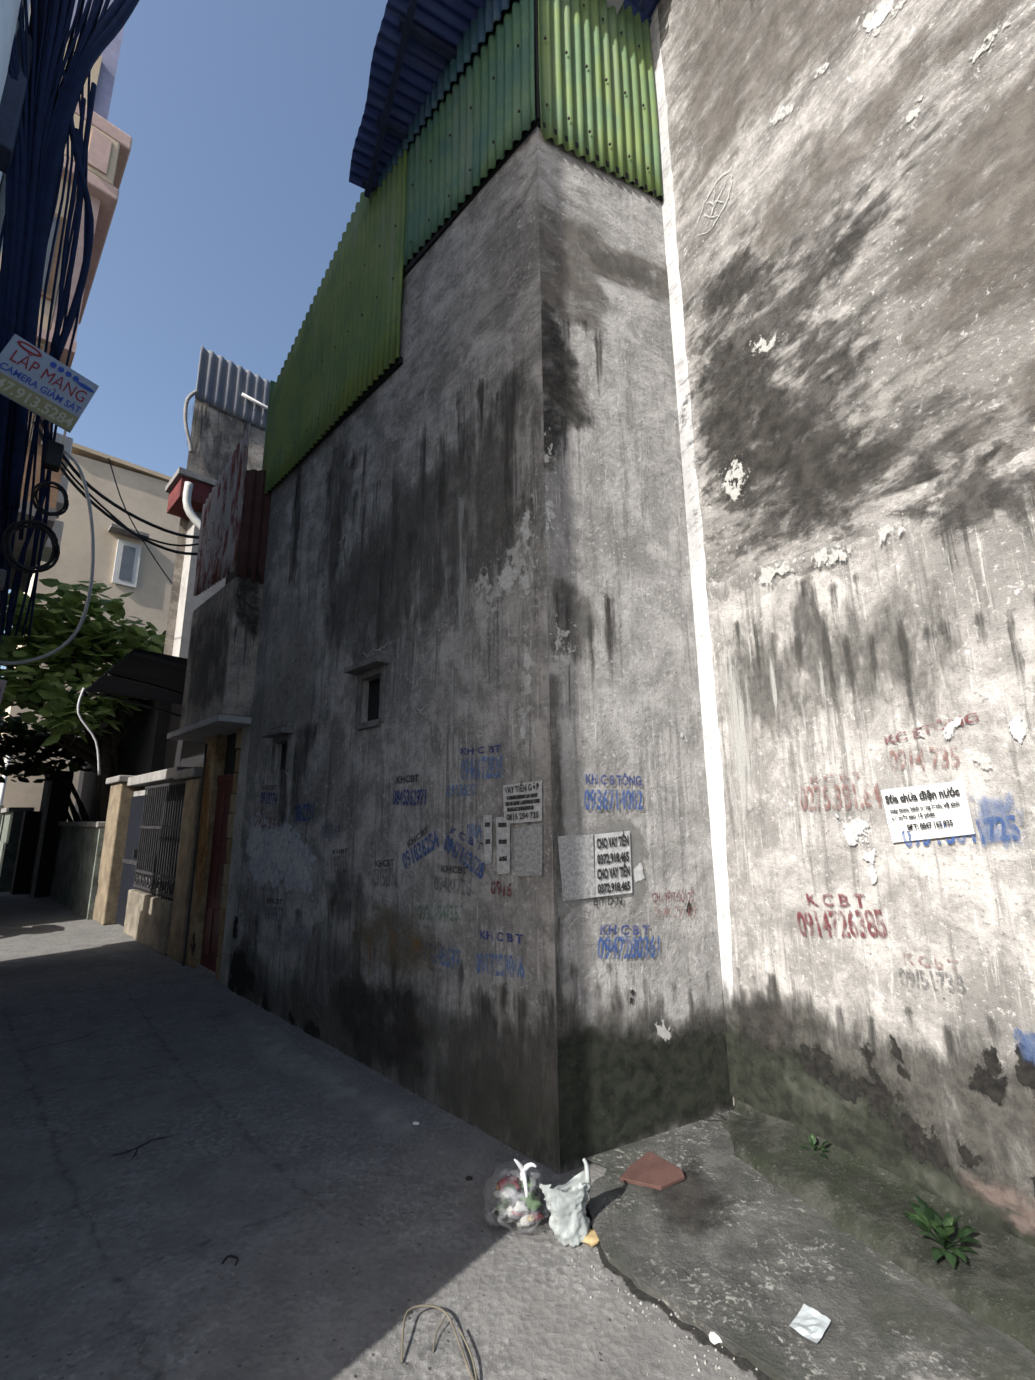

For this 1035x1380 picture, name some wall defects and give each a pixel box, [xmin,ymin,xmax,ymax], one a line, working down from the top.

leakage [674,0,1035,827]
leakage [234,205,1035,1199]
crack [110,1133,179,1158]
leakage [653,1161,727,1232]
crack [586,1199,772,1380]